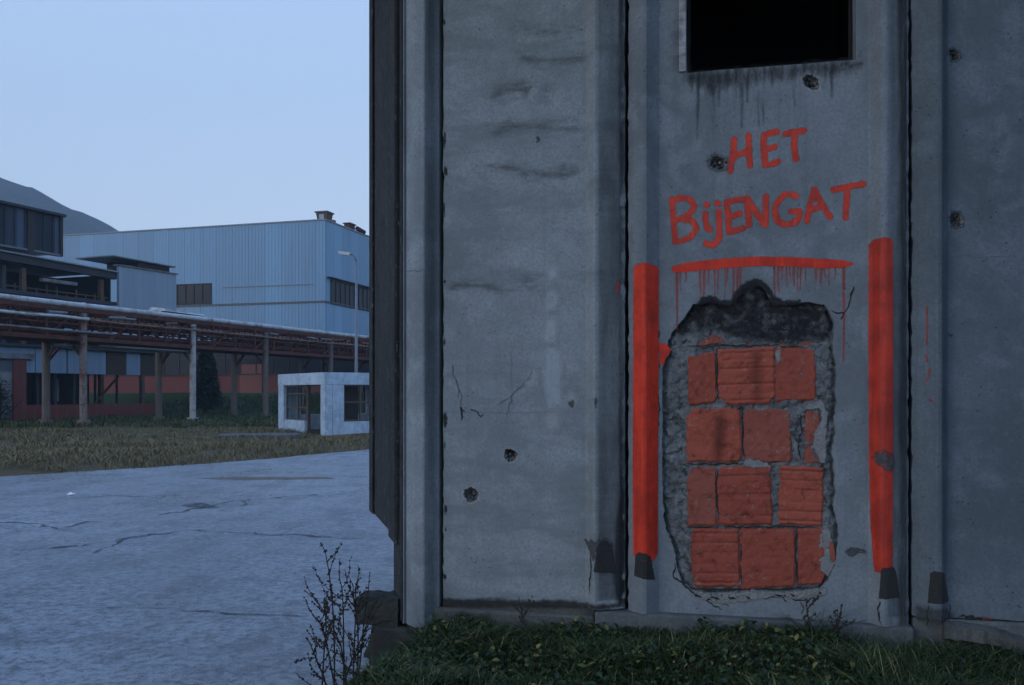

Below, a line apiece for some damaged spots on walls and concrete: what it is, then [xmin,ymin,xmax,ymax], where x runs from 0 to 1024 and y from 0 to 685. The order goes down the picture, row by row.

spalling [800,73,821,91]
spalling [708,155,729,171]
spalling [949,211,965,229]
crack [831,286,854,319]
crack [448,352,581,420]
spalling [503,448,519,463]
spalling [462,486,481,504]
spalling [693,588,827,604]